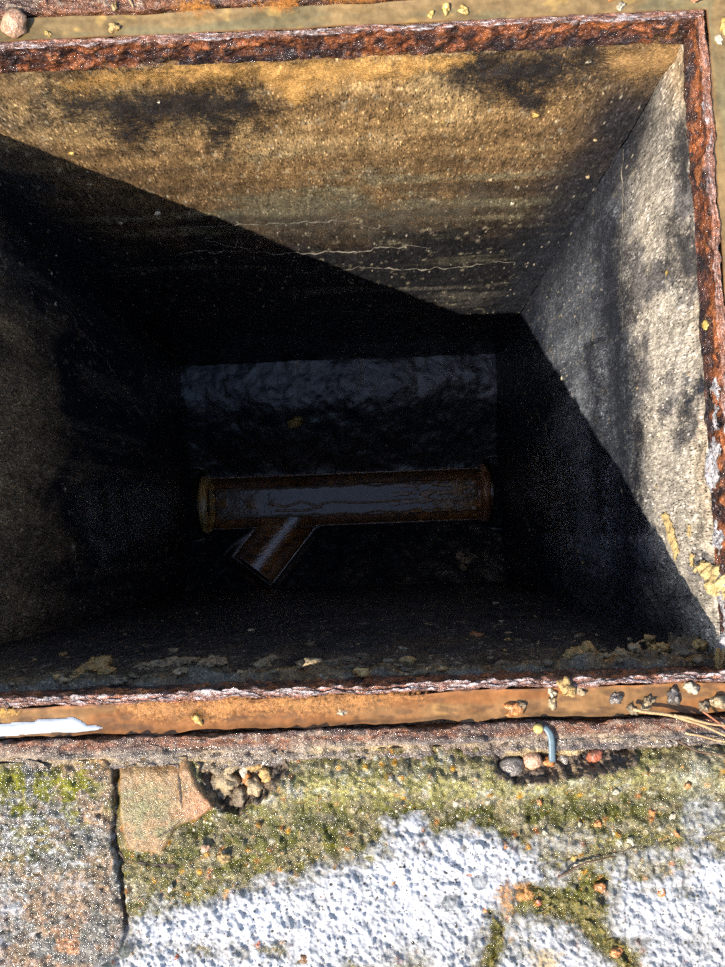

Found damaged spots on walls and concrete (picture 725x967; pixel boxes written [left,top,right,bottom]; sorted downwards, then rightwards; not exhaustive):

damp [436,34,610,114]
damp [30,70,278,164]
corrosion [115,691,423,722]